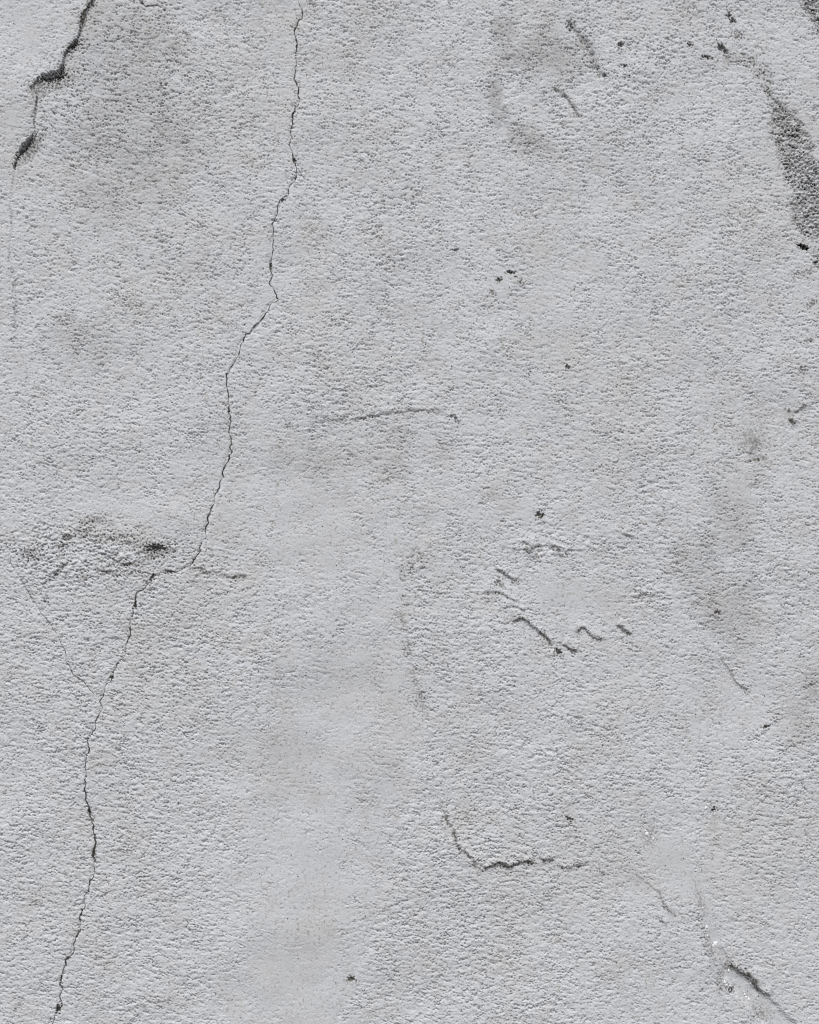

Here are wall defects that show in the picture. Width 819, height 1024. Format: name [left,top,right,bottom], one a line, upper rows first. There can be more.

crack [44,4,303,1024]
crack [445,816,603,874]